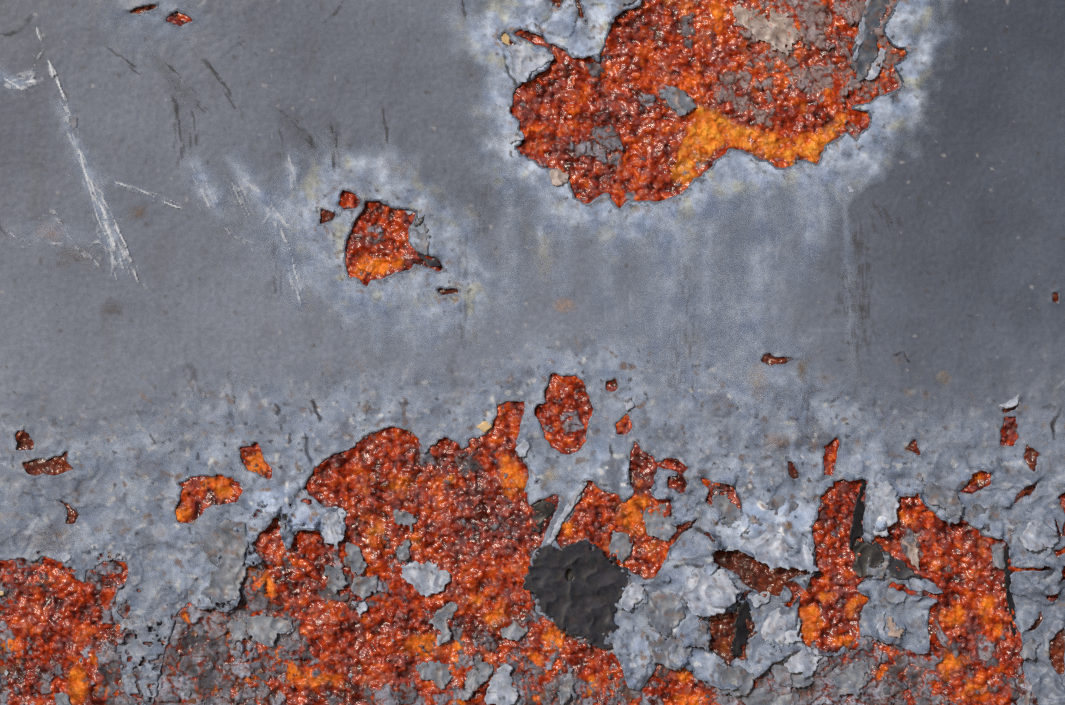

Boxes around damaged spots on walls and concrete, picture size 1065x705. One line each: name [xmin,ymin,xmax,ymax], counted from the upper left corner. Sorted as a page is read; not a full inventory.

corrosion [503,0,906,208]
corrosion [320,190,443,286]
peeling [515,439,530,457]
corrosion [999,394,1039,471]
corrosion [0,373,690,705]
peeling [608,530,633,564]
peeling [640,503,677,541]
corrosion [701,478,741,509]
peeling [711,485,819,573]
peeling [868,480,899,537]
corrosion [785,437,1065,669]
peeling [617,565,1041,705]